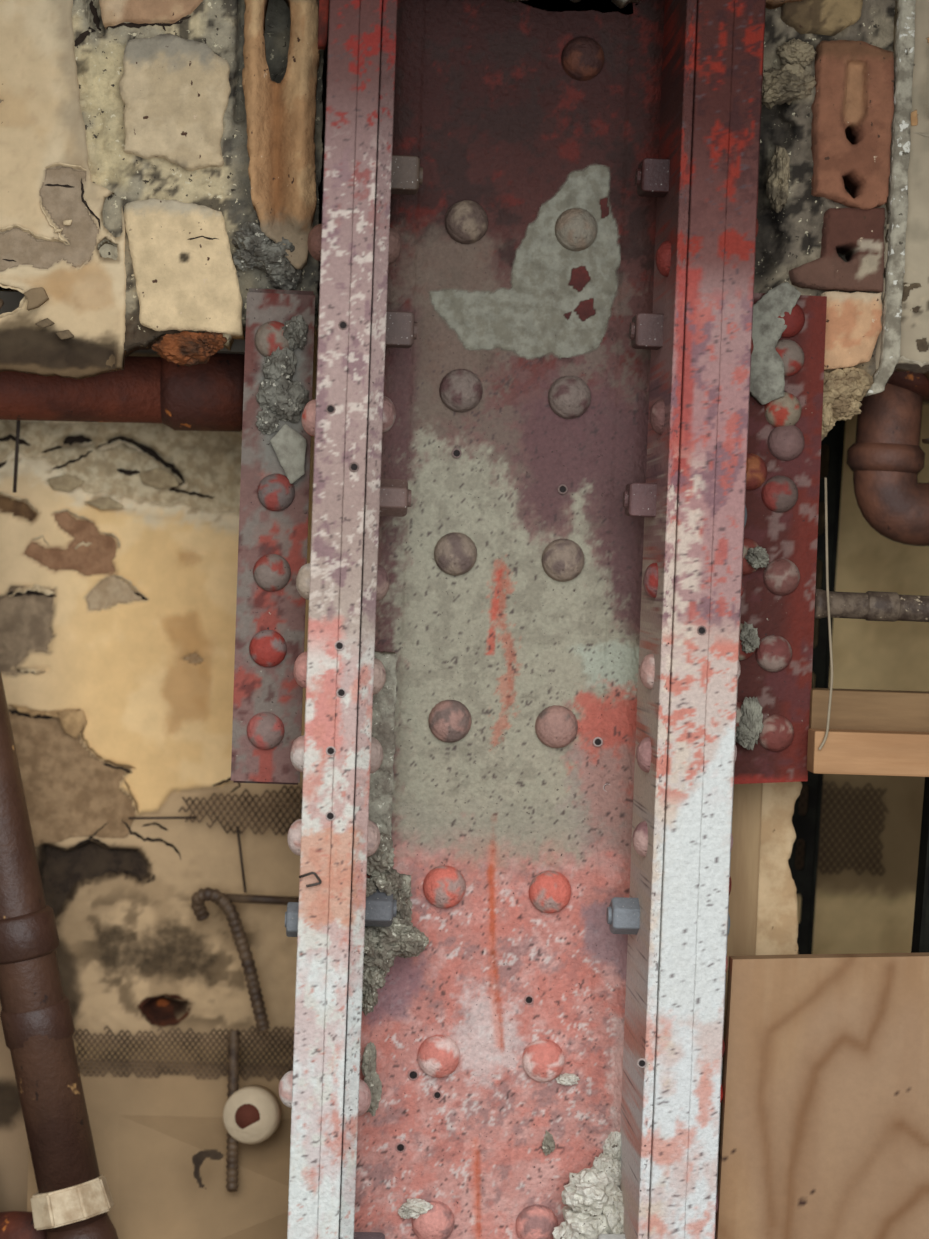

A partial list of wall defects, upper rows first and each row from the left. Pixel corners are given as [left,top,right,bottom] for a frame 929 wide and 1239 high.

spalling [505,0,641,15]
flaking render [0,162,116,271]
peeling [430,165,621,359]
flaking render [0,287,114,368]
crack [0,434,214,498]
spalling [0,421,242,610]
flaking render [0,584,57,674]
crack [213,777,241,793]
crack [90,820,181,860]